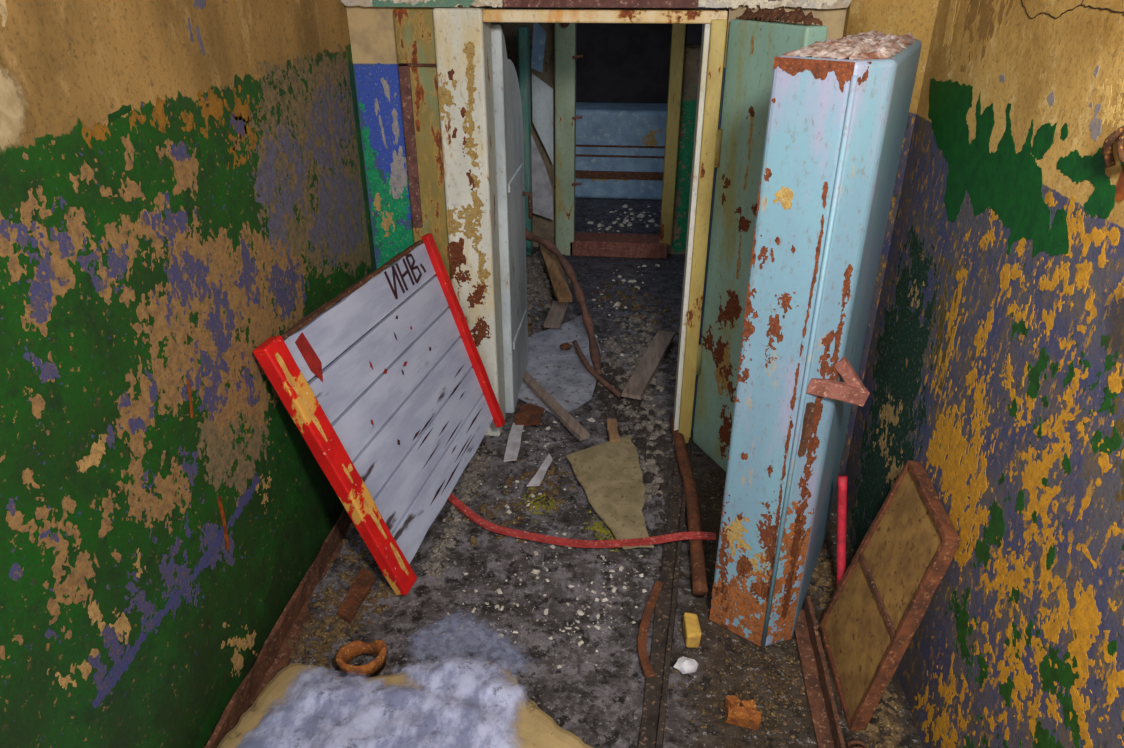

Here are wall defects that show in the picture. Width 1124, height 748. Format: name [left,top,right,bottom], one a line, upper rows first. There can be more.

flaking render [698,0,837,9]
crack [1021,0,1124,19]
corrosion [438,41,491,347]
corrosion [1115,166,1124,202]
peeling [0,44,414,542]
peeling [847,0,1124,748]
peeling [6,468,159,692]
peeling [0,635,23,660]
peeling [221,622,259,678]